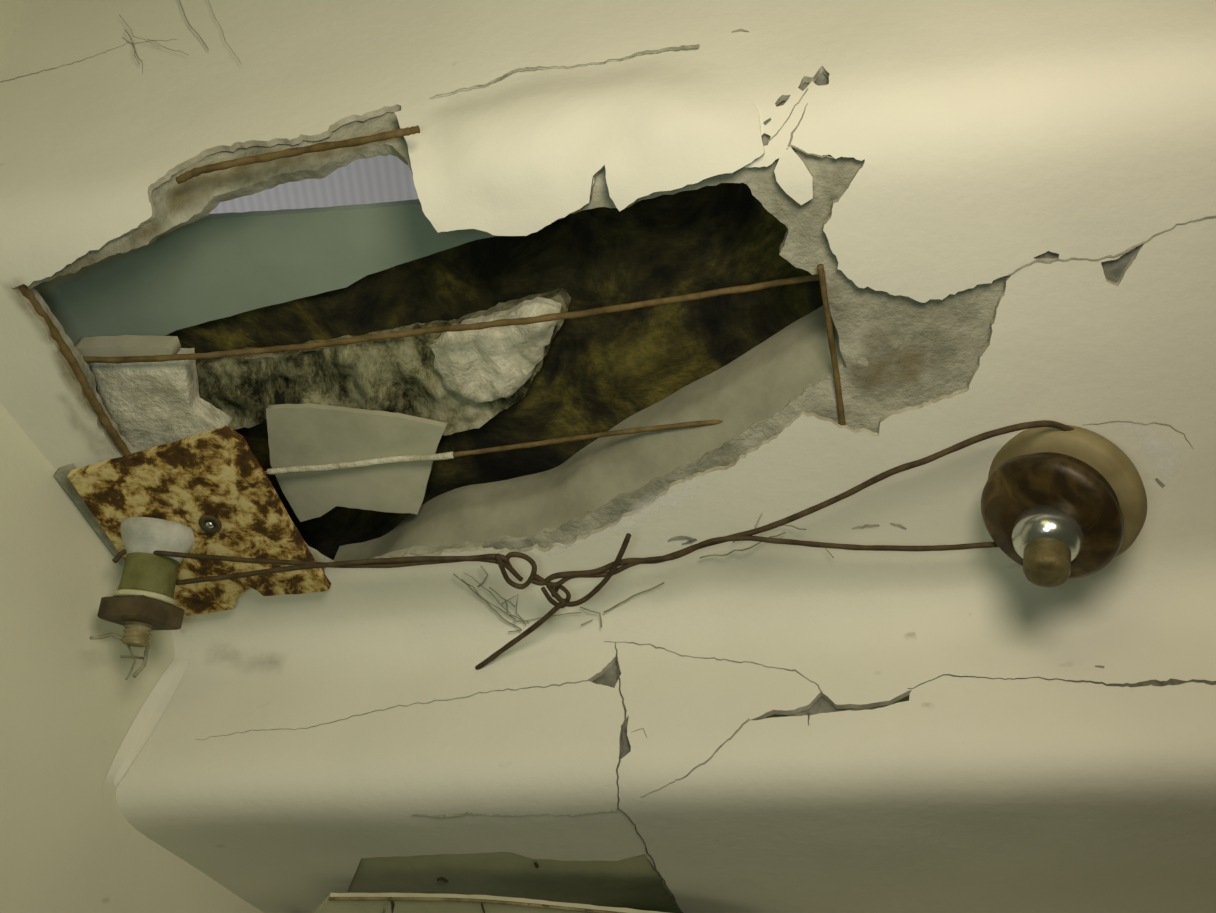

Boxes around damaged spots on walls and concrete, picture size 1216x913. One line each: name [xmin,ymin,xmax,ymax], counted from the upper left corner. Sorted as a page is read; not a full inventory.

crack [0,38,177,83]
crack [431,44,700,98]
spalling [17,110,413,453]
spalling [304,147,1006,574]
crack [1009,215,1216,283]
crack [195,641,1216,913]